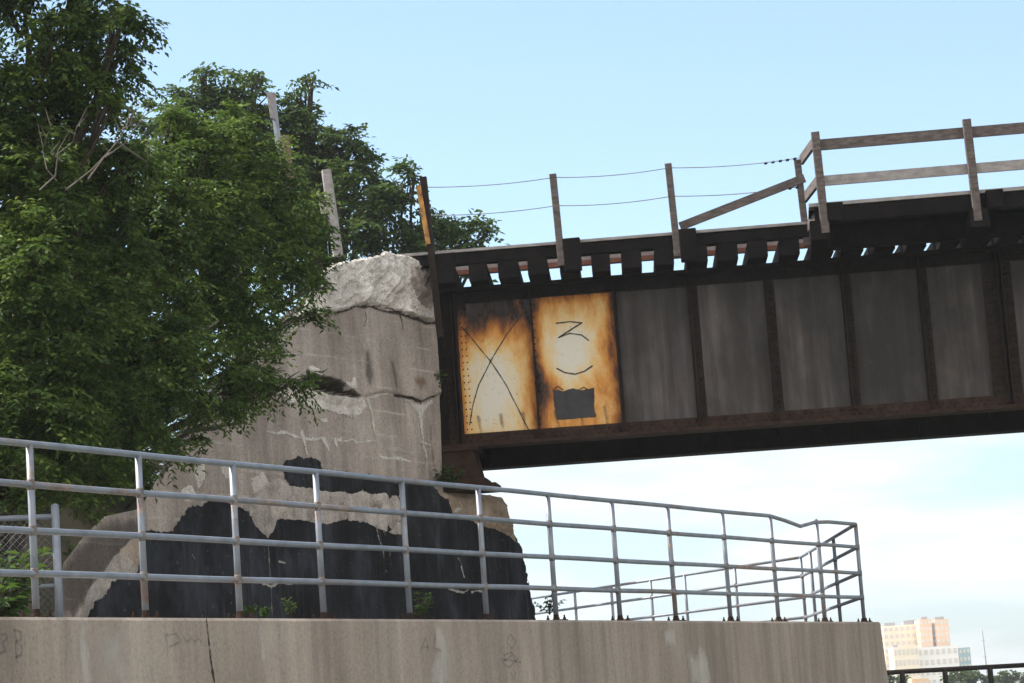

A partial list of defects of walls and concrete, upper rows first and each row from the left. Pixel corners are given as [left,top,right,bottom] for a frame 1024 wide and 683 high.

spalling [278,365,366,418]
rust [456,292,622,434]
peeling [144,445,402,565]
spalling [440,493,517,542]
peeling [74,539,140,617]
crack [206,618,215,683]